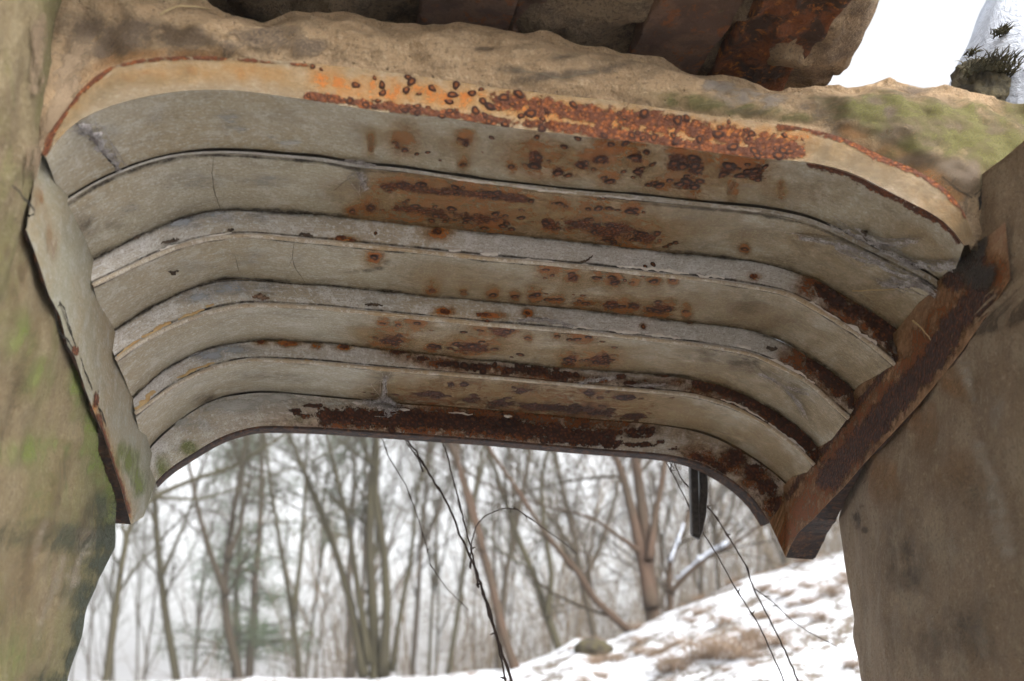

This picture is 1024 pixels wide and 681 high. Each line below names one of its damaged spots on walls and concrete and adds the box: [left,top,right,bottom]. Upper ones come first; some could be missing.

corrosion [42,56,273,156]
corrosion [257,340,321,349]
corrosion [286,63,1010,554]